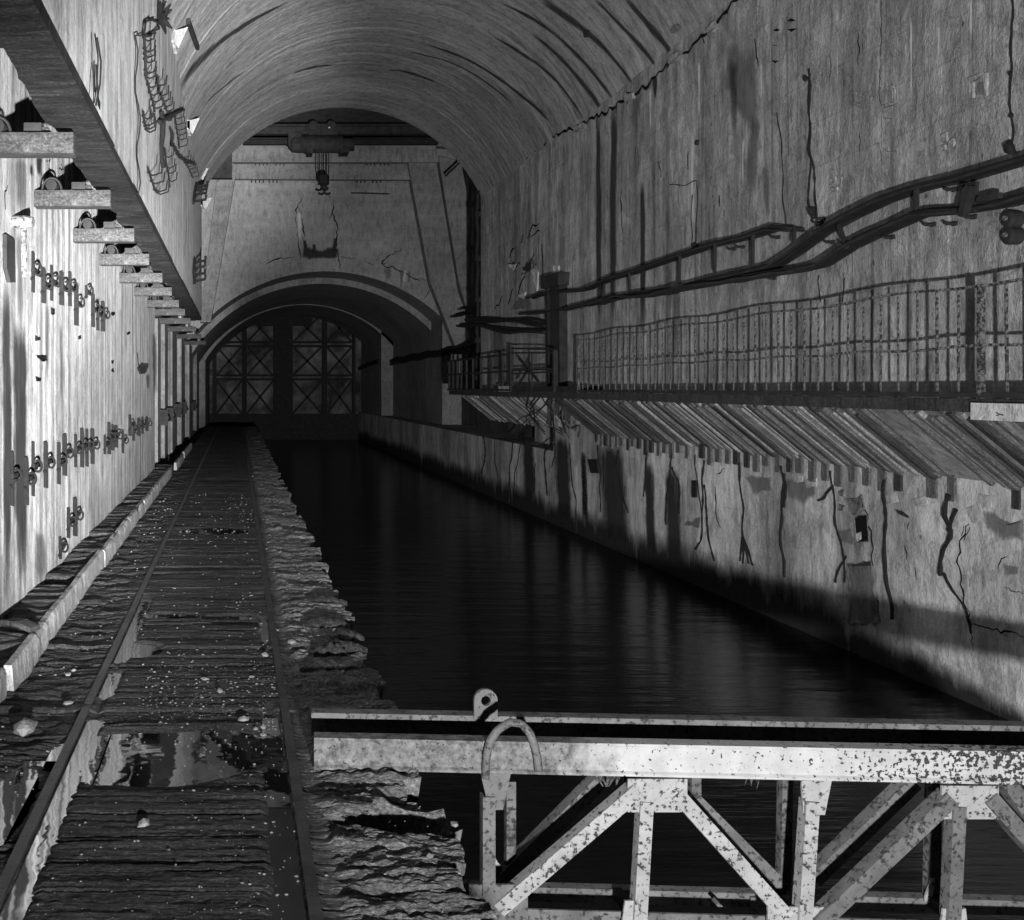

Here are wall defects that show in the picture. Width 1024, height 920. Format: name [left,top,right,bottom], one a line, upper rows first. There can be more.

crack [526,0,738,159]
crack [265,197,430,296]
spalling [837,489,881,626]
crack [956,524,1023,651]